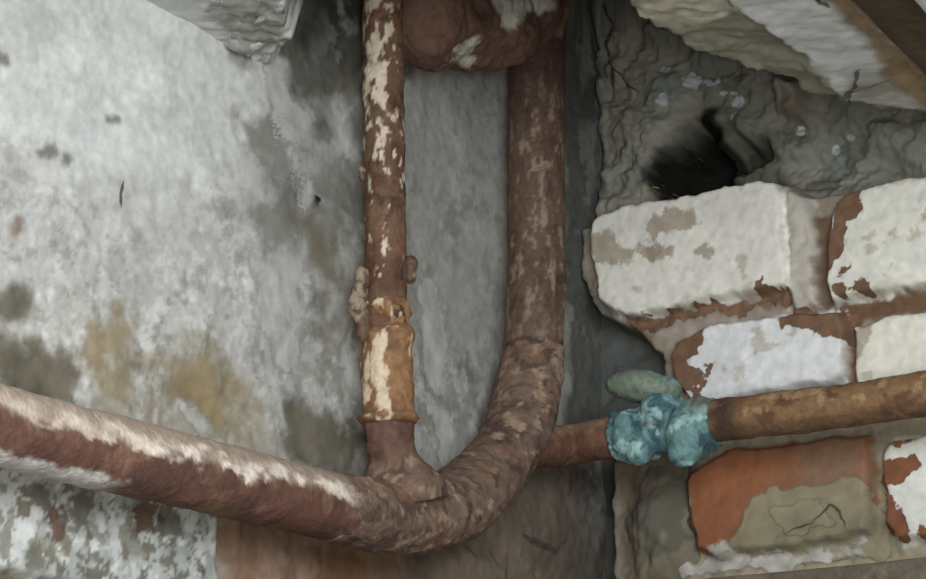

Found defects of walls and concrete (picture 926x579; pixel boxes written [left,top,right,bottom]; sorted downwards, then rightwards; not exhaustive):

crack [603,4,639,98]
water stain [681,72,745,120]
crack [844,70,889,102]
spalling [648,114,746,201]
water stain [0,284,31,321]
water stain [245,118,351,375]
peeling [627,189,877,346]
water stain [0,336,79,404]
peeling [671,329,713,398]
water stain [281,396,367,473]
crack [785,504,849,534]
peeling [881,439,926,543]